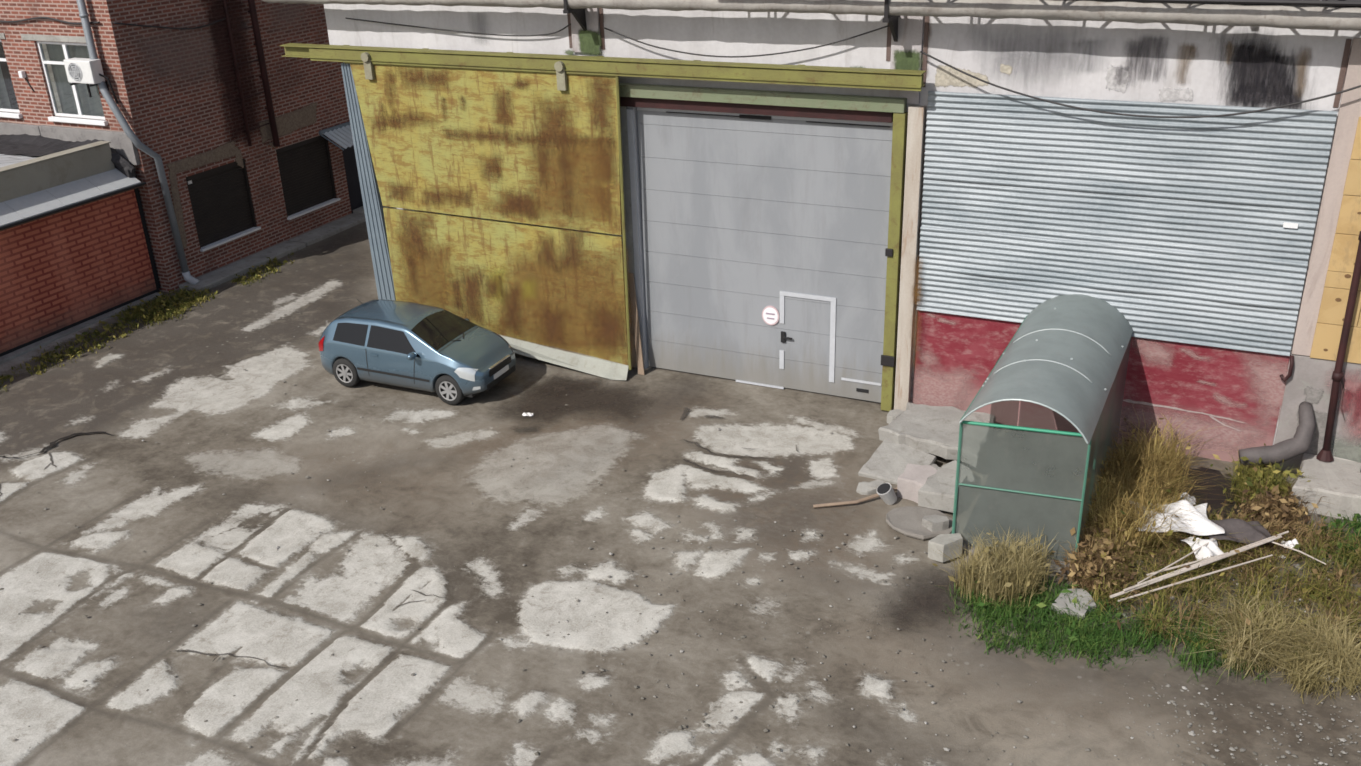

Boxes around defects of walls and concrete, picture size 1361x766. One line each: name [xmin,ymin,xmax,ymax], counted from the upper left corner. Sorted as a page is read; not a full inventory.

water stain [1119,38,1163,84]
water stain [1229,37,1302,109]
rust [446,80,611,199]
rust [425,192,470,204]
rust [506,194,533,215]
rust [404,220,624,356]
peeling [911,352,972,409]
peeling [1135,339,1209,364]
peeling [1199,358,1289,423]
flaking render [1297,376,1361,455]
crack [0,432,112,496]
spalling [1175,467,1245,520]